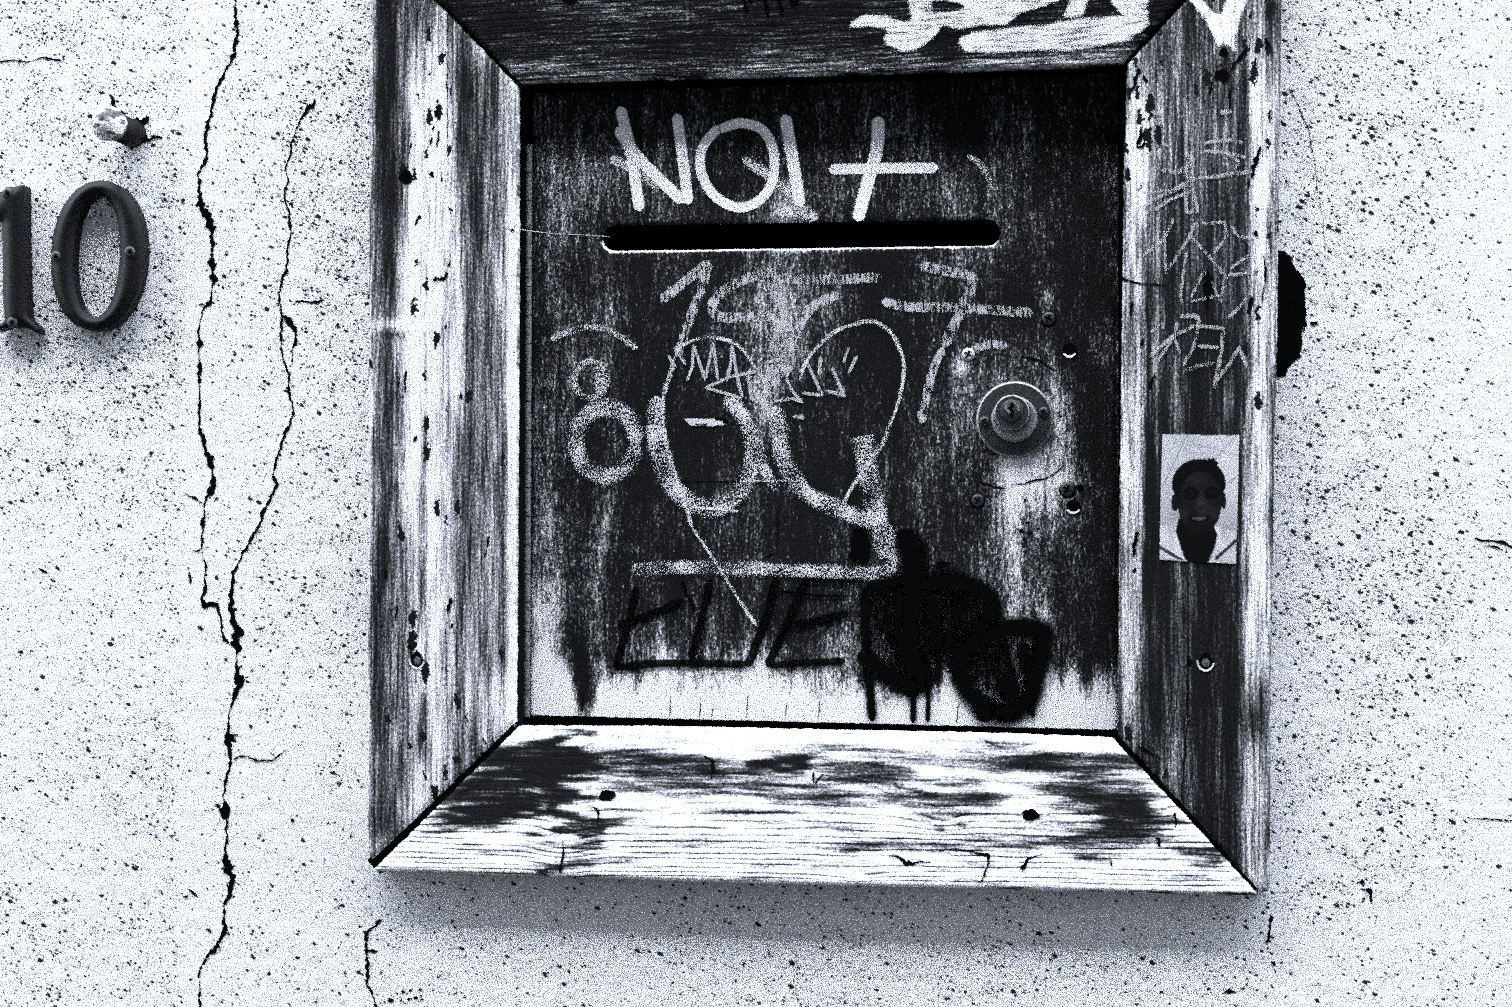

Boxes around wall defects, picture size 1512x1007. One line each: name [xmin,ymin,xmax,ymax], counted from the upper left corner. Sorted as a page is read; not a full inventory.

crack [0,55,65,63]
crack [184,0,326,1007]
crack [364,919,382,1007]